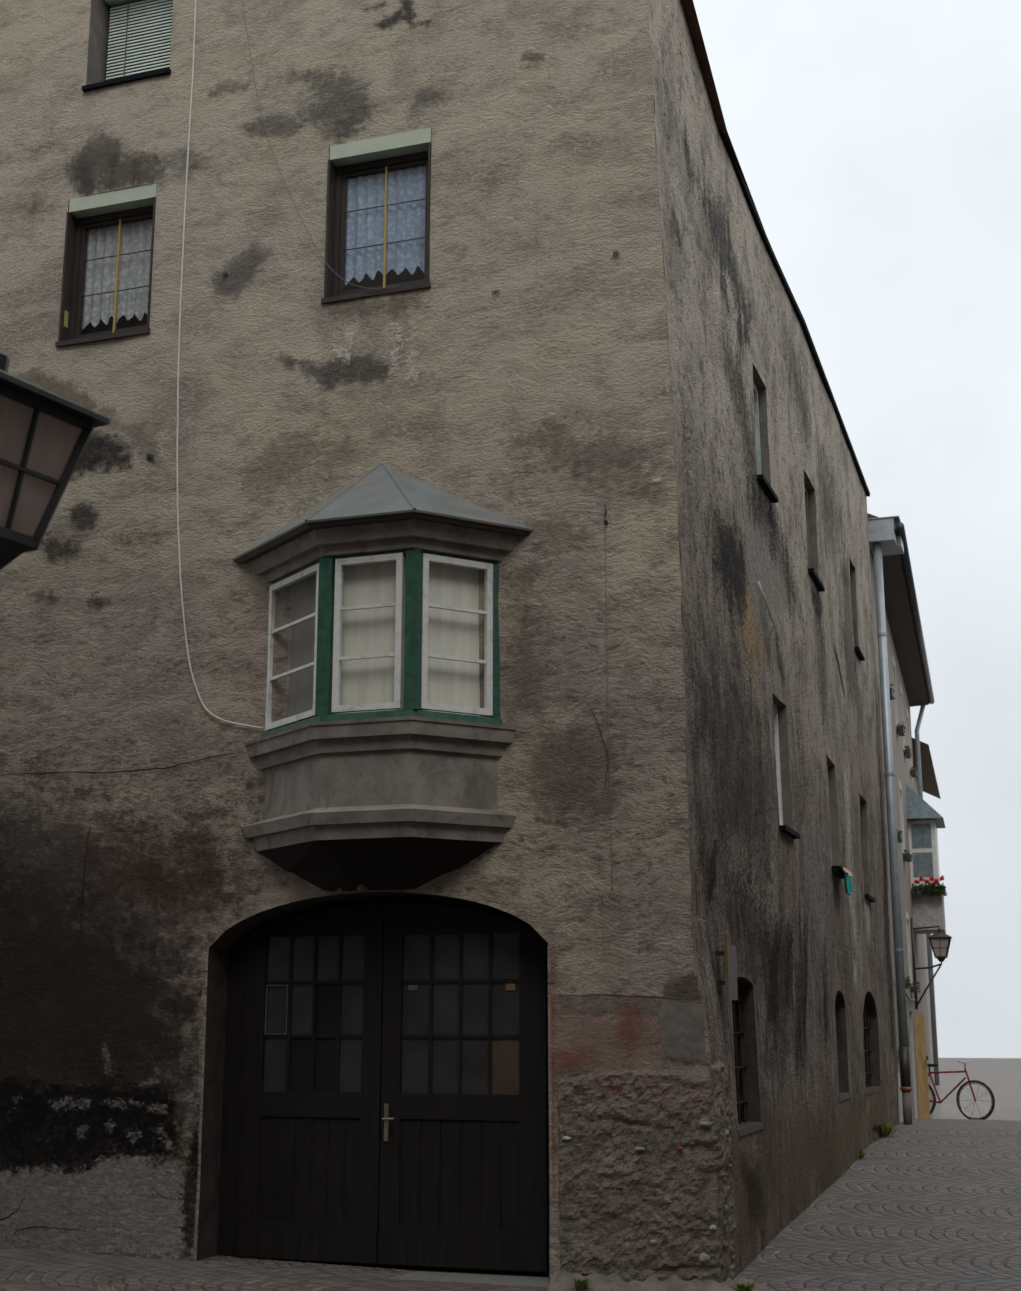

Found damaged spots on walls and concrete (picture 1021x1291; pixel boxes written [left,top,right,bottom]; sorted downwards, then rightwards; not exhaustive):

damp [244,71,377,138]
damp [67,134,158,195]
damp [281,316,419,390]
damp [842,751,871,992]
spalling [557,1060,737,1283]